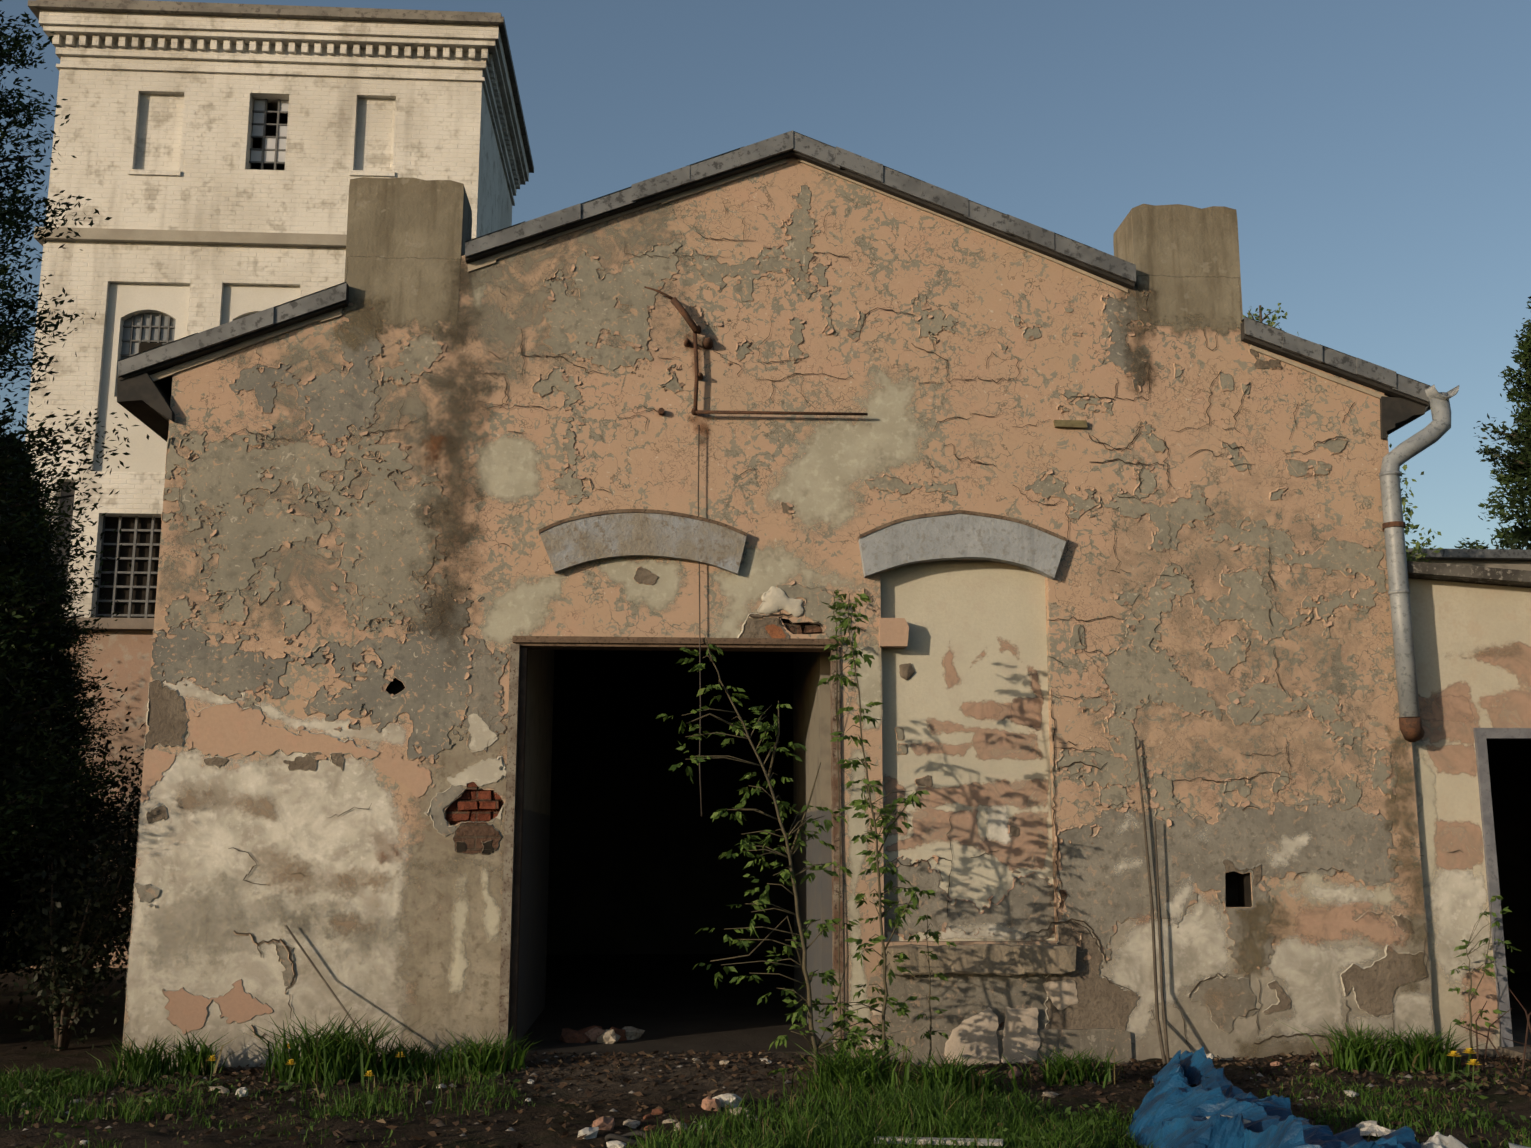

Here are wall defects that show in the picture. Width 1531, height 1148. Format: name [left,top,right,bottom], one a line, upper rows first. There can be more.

damp [160,202,675,636]
crack [480,286,609,433]
peeling [474,184,869,505]
crack [662,316,854,409]
flaking render [767,368,958,530]
crack [228,847,303,885]
peeling [124,256,566,1069]
flaking render [599,558,682,612]
flaking render [712,541,915,755]
peeling [847,420,1490,1061]
crack [1026,616,1394,1051]
crack [233,930,296,1040]